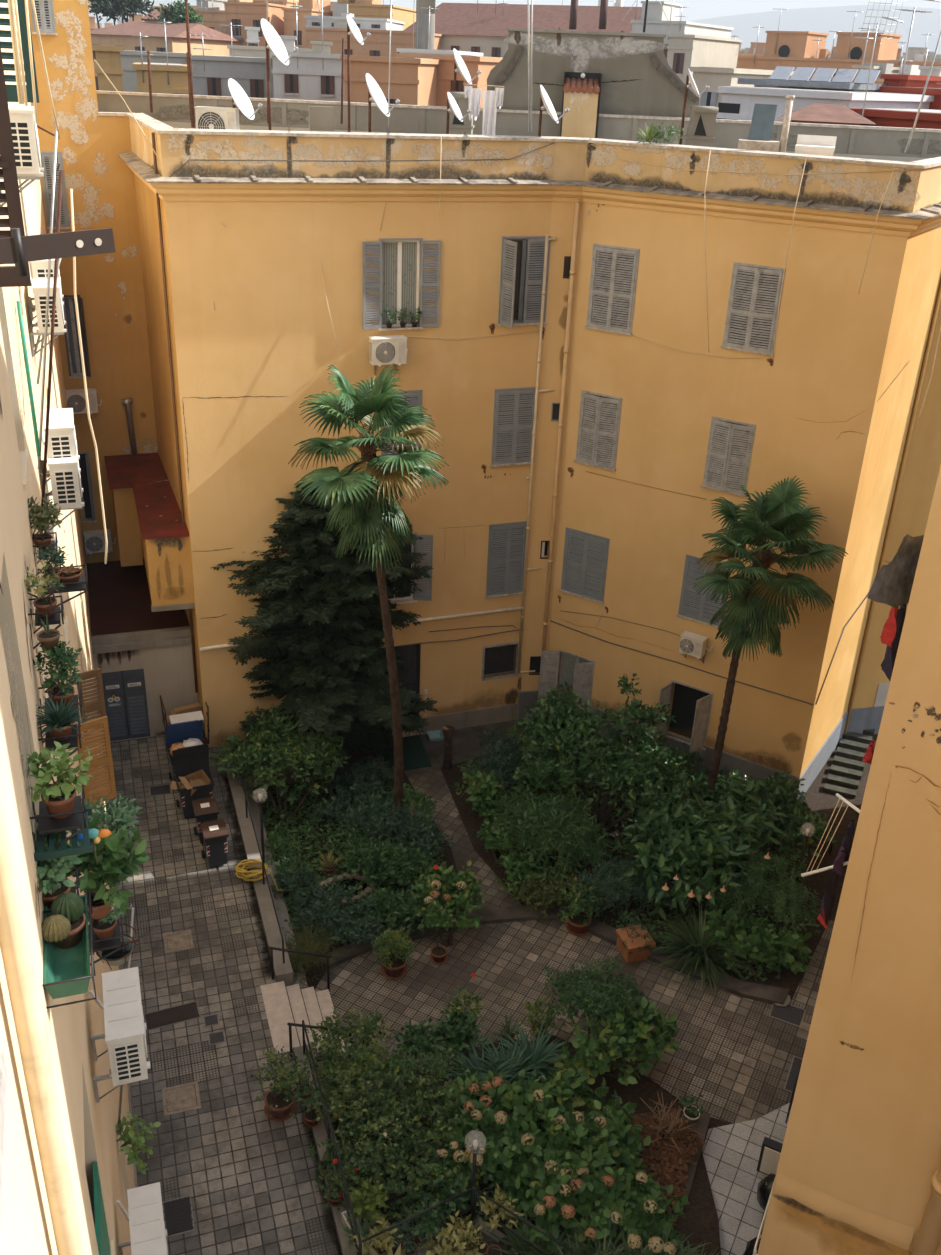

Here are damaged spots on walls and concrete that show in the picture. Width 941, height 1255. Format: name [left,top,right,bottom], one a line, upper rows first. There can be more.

peeling [48,0,115,228]
peeling [167,128,386,169]
peeling [412,143,553,169]
peeling [589,145,921,209]
crack [182,396,289,481]
peeling [902,702,941,748]
crack [851,765,941,980]